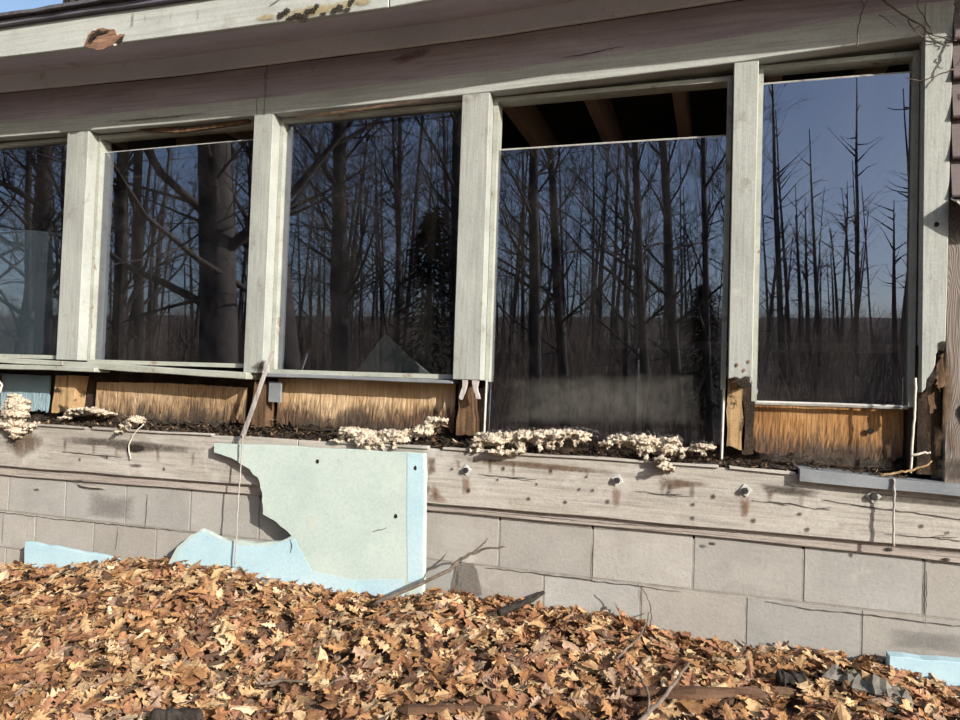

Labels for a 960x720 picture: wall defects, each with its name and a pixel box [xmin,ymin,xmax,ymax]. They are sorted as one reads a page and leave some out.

spalling [276,0,355,23]
peeling [84,28,125,50]
crack [752,499,960,541]